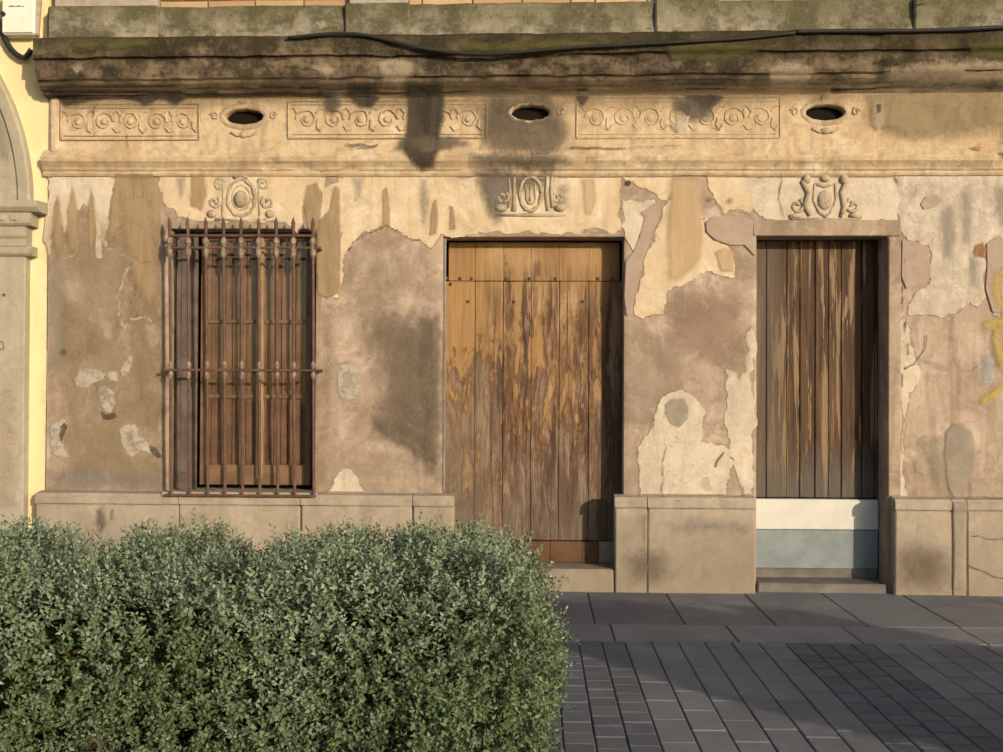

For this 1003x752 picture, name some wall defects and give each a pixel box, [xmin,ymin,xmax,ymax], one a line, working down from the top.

damp [400,82,467,170]
peeling [43,176,116,255]
peeling [158,172,1003,499]
flaking render [50,419,70,459]
flaking render [75,354,162,458]